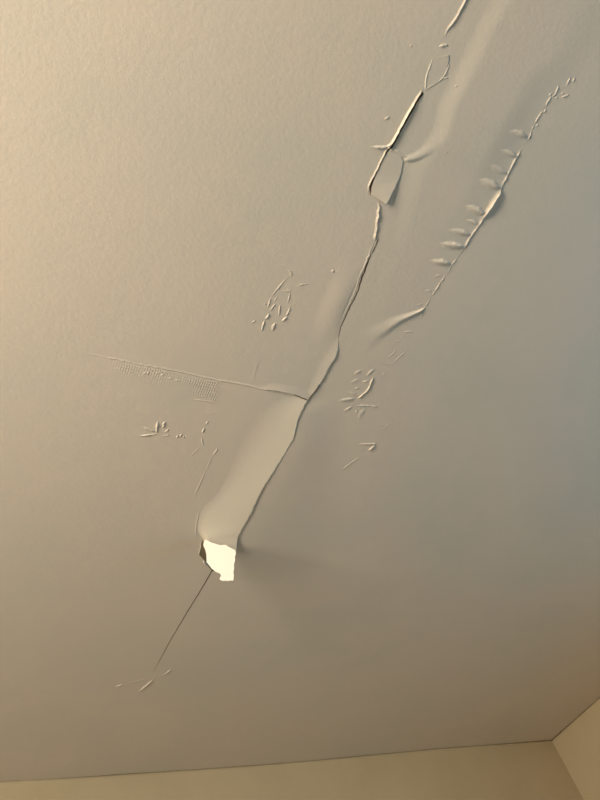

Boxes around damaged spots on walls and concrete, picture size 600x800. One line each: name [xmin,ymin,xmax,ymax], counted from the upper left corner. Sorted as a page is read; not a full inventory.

crack [444,0,466,37]
crack [71,88,424,401]
crack [153,571,212,672]